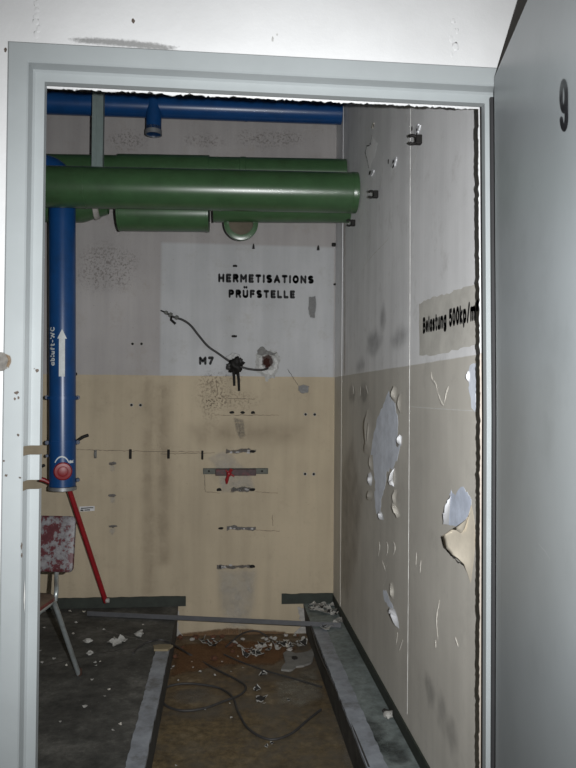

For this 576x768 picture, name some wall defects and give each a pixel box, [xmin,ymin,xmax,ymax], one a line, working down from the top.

spalling [255,346,280,381]
peeling [466,362,477,411]
peeling [363,377,403,520]
peeling [441,487,475,582]
peeling [383,561,399,629]